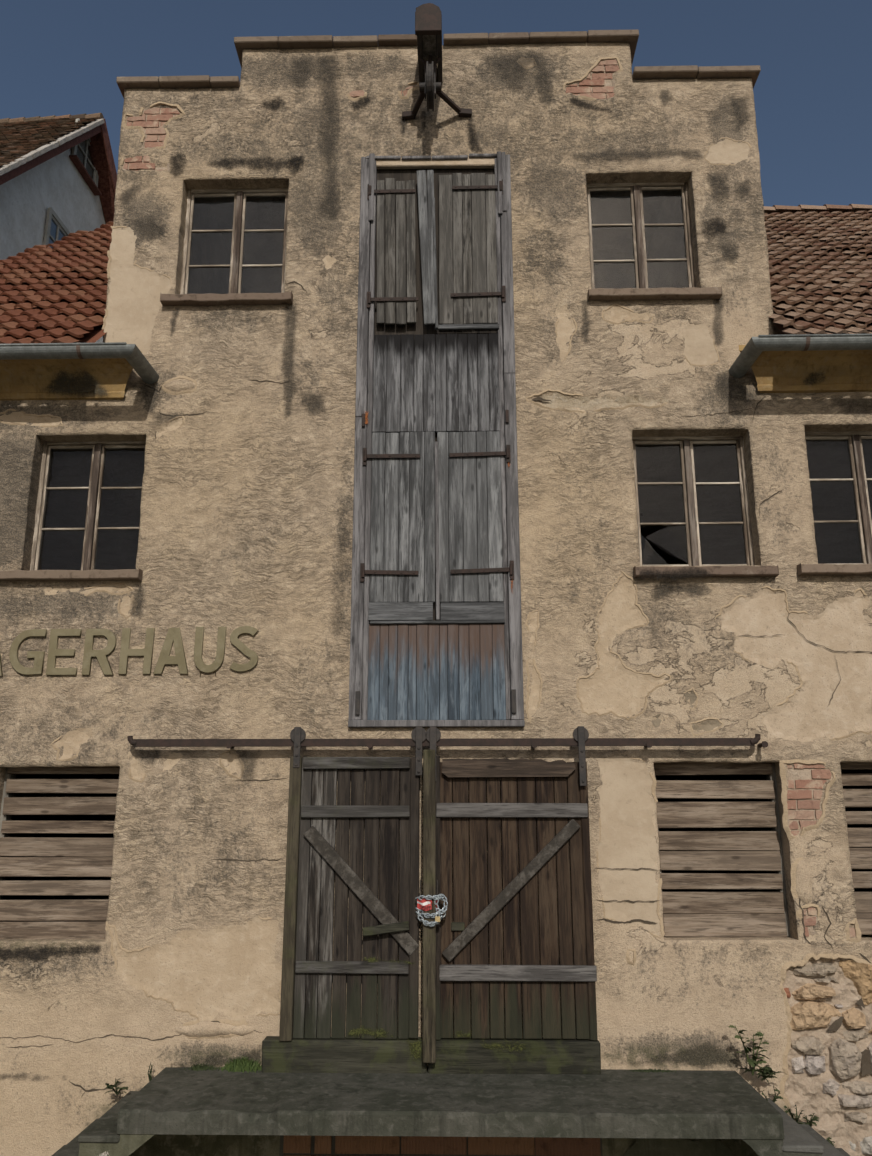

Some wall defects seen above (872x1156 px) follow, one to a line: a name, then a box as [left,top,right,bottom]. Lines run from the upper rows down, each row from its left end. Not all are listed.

flaking render [563,57,623,101]
flaking render [120,101,185,172]
damp [295,56,338,215]
damp [282,307,323,416]
peeling [576,570,671,727]
peeling [715,586,872,742]
flaking render [779,759,836,841]
damp [0,945,99,961]
flaking render [796,903,820,937]
crack [1,1034,181,1048]
damp [634,1044,737,1067]
flaking render [779,918,872,1156]